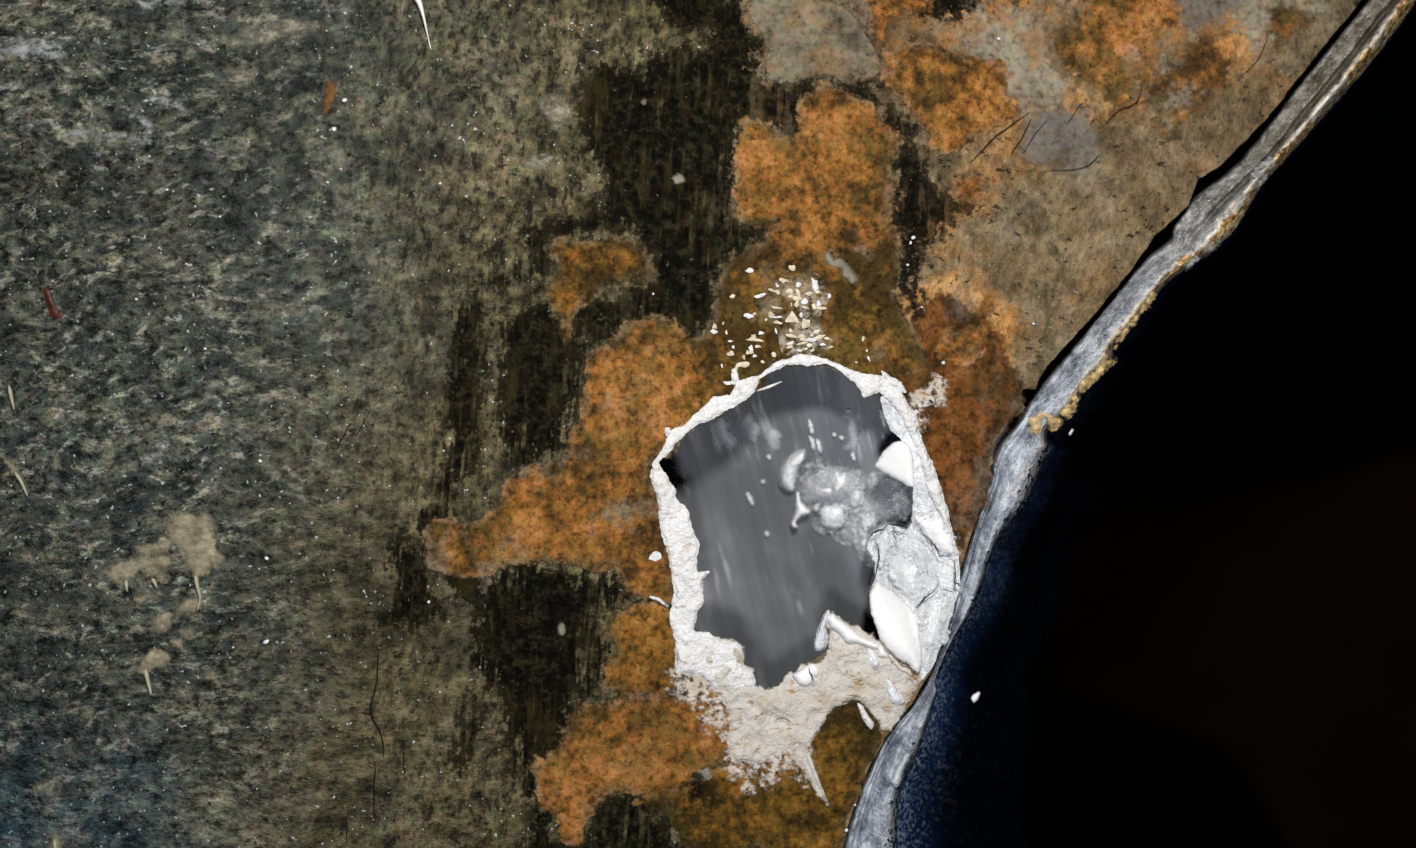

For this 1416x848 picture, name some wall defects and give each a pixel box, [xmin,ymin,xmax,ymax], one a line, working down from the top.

rust [834,0,1020,156]
rust [1037,0,1232,140]
rust [1266,1,1315,56]
leakage [488,221,564,297]
leakage [352,298,648,848]
rust [422,80,1025,848]
spalling [649,265,956,807]
leakage [684,772,719,807]